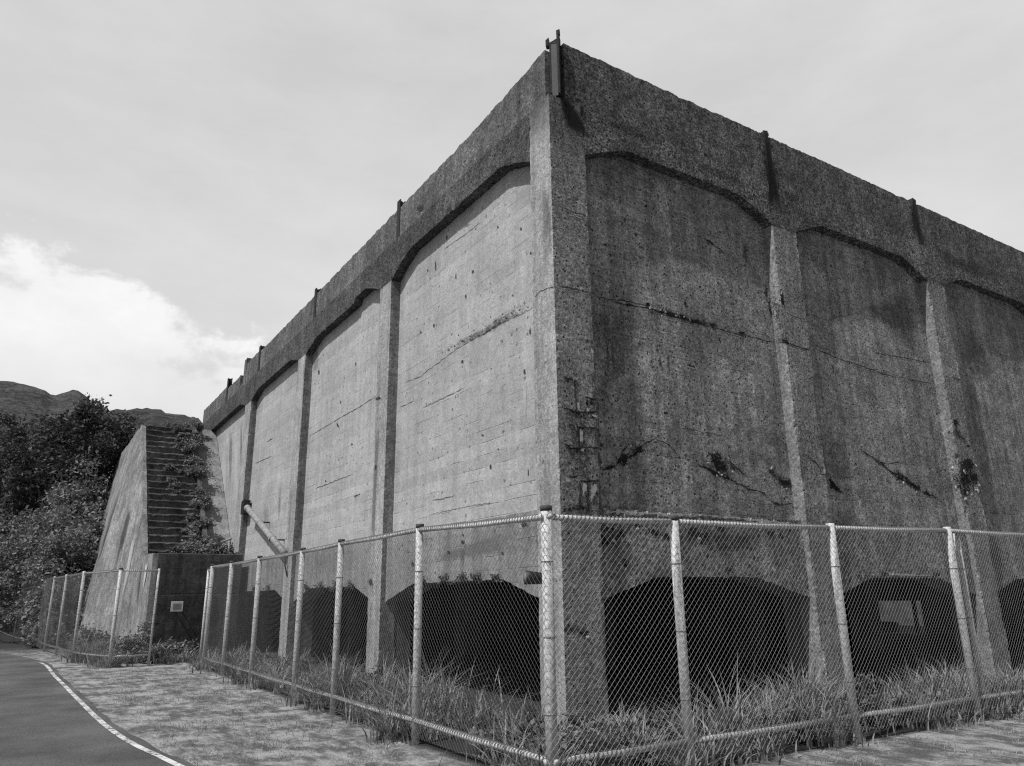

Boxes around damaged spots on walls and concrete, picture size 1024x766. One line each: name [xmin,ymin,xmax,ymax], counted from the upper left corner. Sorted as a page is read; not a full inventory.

crack [401,285,961,407]
spalling [563,376,792,574]
crack [602,428,792,506]
crack [858,447,945,504]
spalling [947,419,981,501]